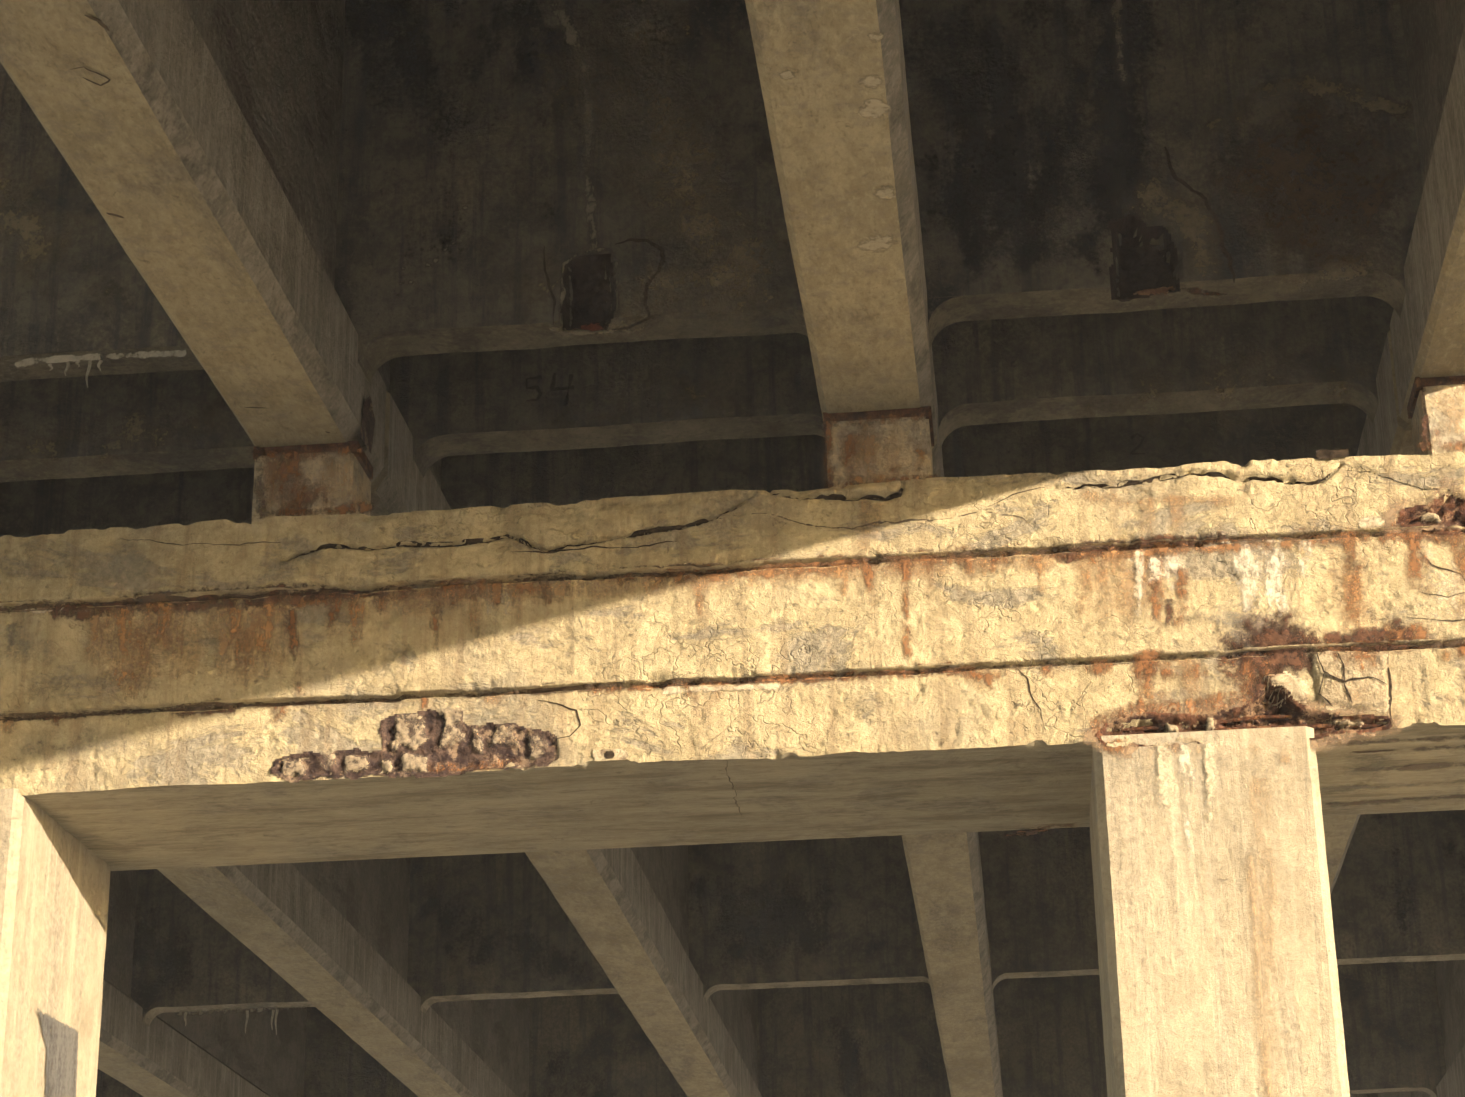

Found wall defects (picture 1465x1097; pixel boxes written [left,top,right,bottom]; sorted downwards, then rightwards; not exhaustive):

water stain [903,0,1163,283]
spalling [550,248,621,336]
crack [612,238,666,330]
spalling [1108,215,1227,302]
water stain [14,350,186,388]
rust [1420,384,1463,451]
rust [51,578,601,689]
crack [124,467,1450,559]
rust [593,497,1465,710]
spalling [1358,480,1465,619]
crack [1409,551,1465,622]
spalling [270,707,559,783]